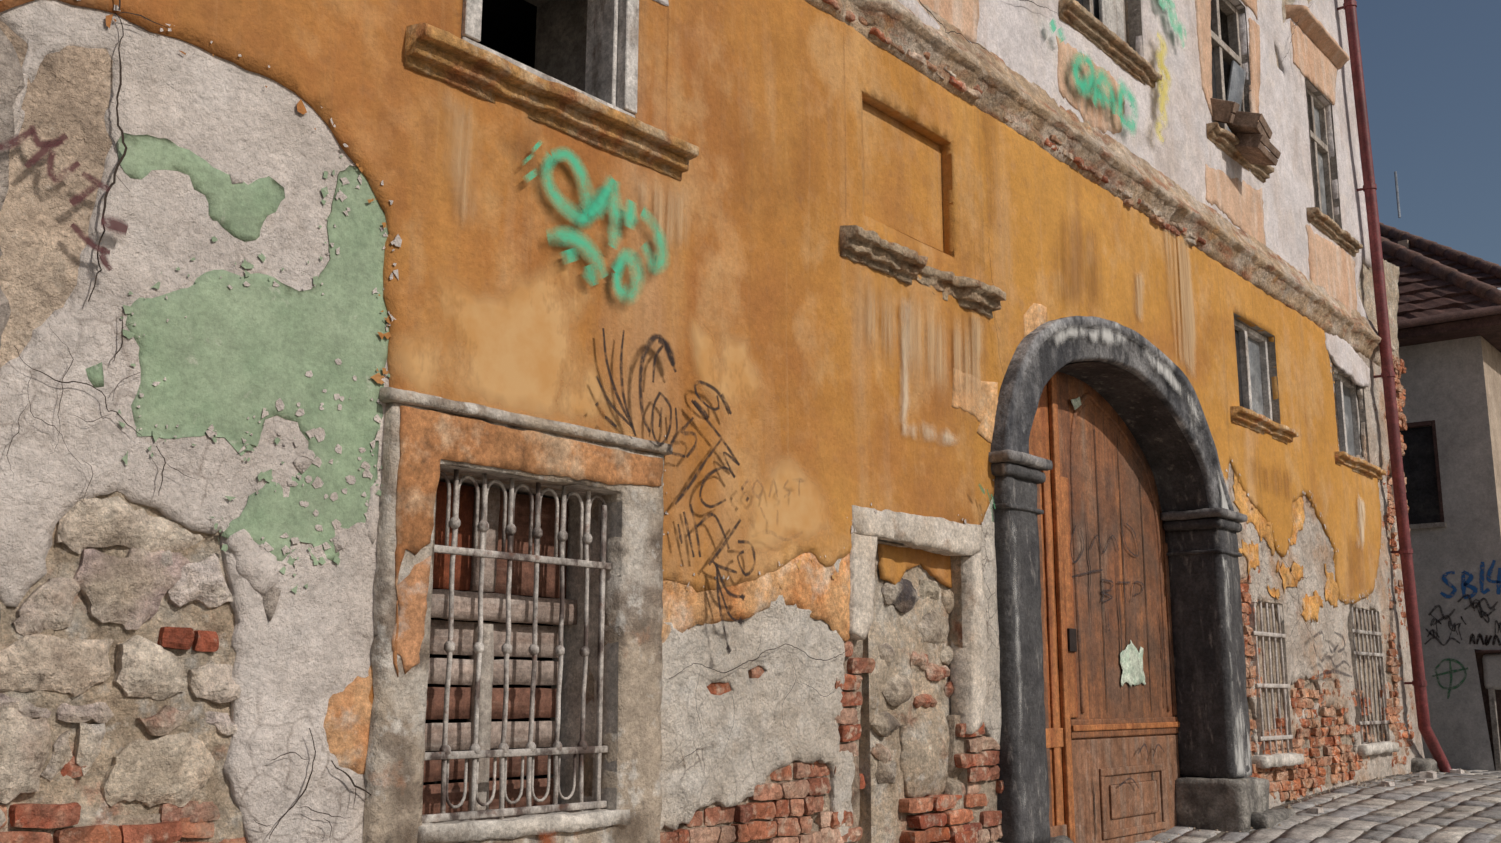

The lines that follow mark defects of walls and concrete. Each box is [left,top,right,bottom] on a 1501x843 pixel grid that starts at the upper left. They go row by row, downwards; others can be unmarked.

crack [6,0,199,502]
peeling [0,0,402,843]
crack [253,728,371,839]
spalling [660,517,875,843]
flaking render [941,479,1004,843]
peeling [1226,260,1425,809]